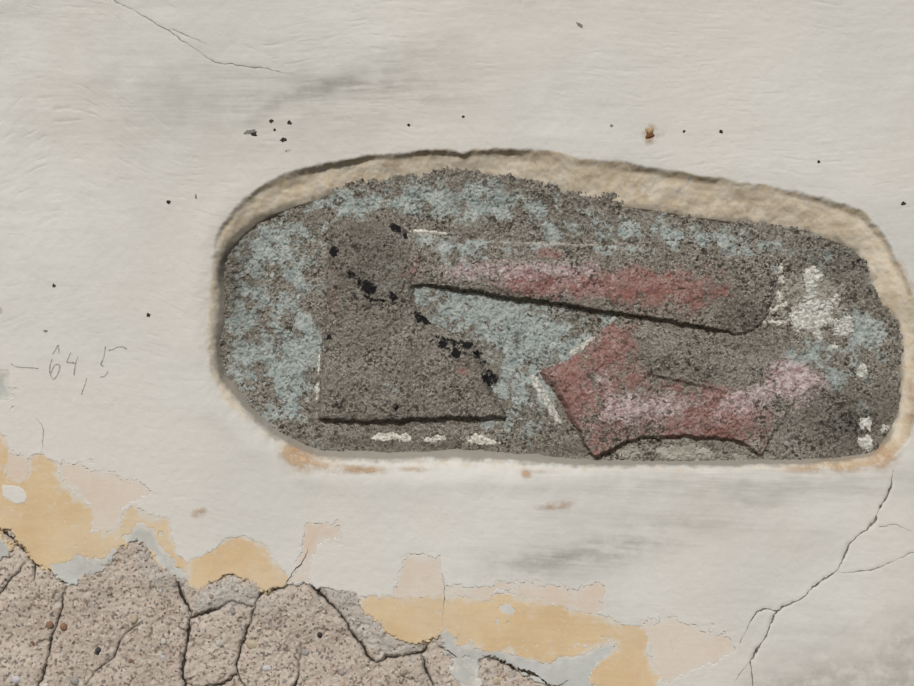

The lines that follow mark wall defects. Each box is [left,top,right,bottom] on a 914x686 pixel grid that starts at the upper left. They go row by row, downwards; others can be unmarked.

crack [114,0,287,73]
peeling [656,443,716,461]
crack [2,532,78,686]
crack [177,542,311,686]
flaking render [0,432,661,686]
crack [312,586,456,686]
crack [482,655,566,686]
crack [737,475,914,686]